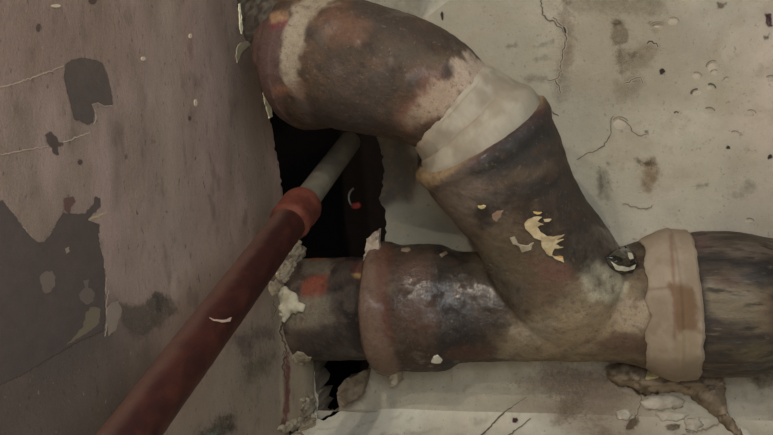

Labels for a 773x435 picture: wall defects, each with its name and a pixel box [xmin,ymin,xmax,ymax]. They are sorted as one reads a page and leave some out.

crack [539,0,568,117]
peeling [0,58,112,155]
crack [576,115,647,160]
peeling [0,197,122,385]
crack [481,397,531,435]
peeling [615,409,639,429]
peeling [640,395,689,430]